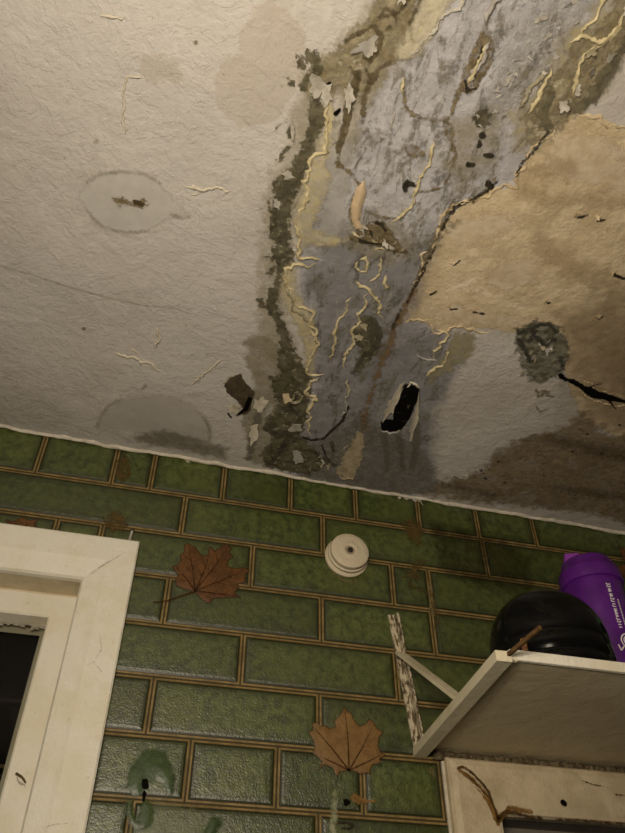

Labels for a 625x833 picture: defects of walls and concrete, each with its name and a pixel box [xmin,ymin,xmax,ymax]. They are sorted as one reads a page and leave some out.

hole [223,373,268,460]
water stain [242,0,625,522]
peeling [288,0,625,505]
crack [558,373,625,409]